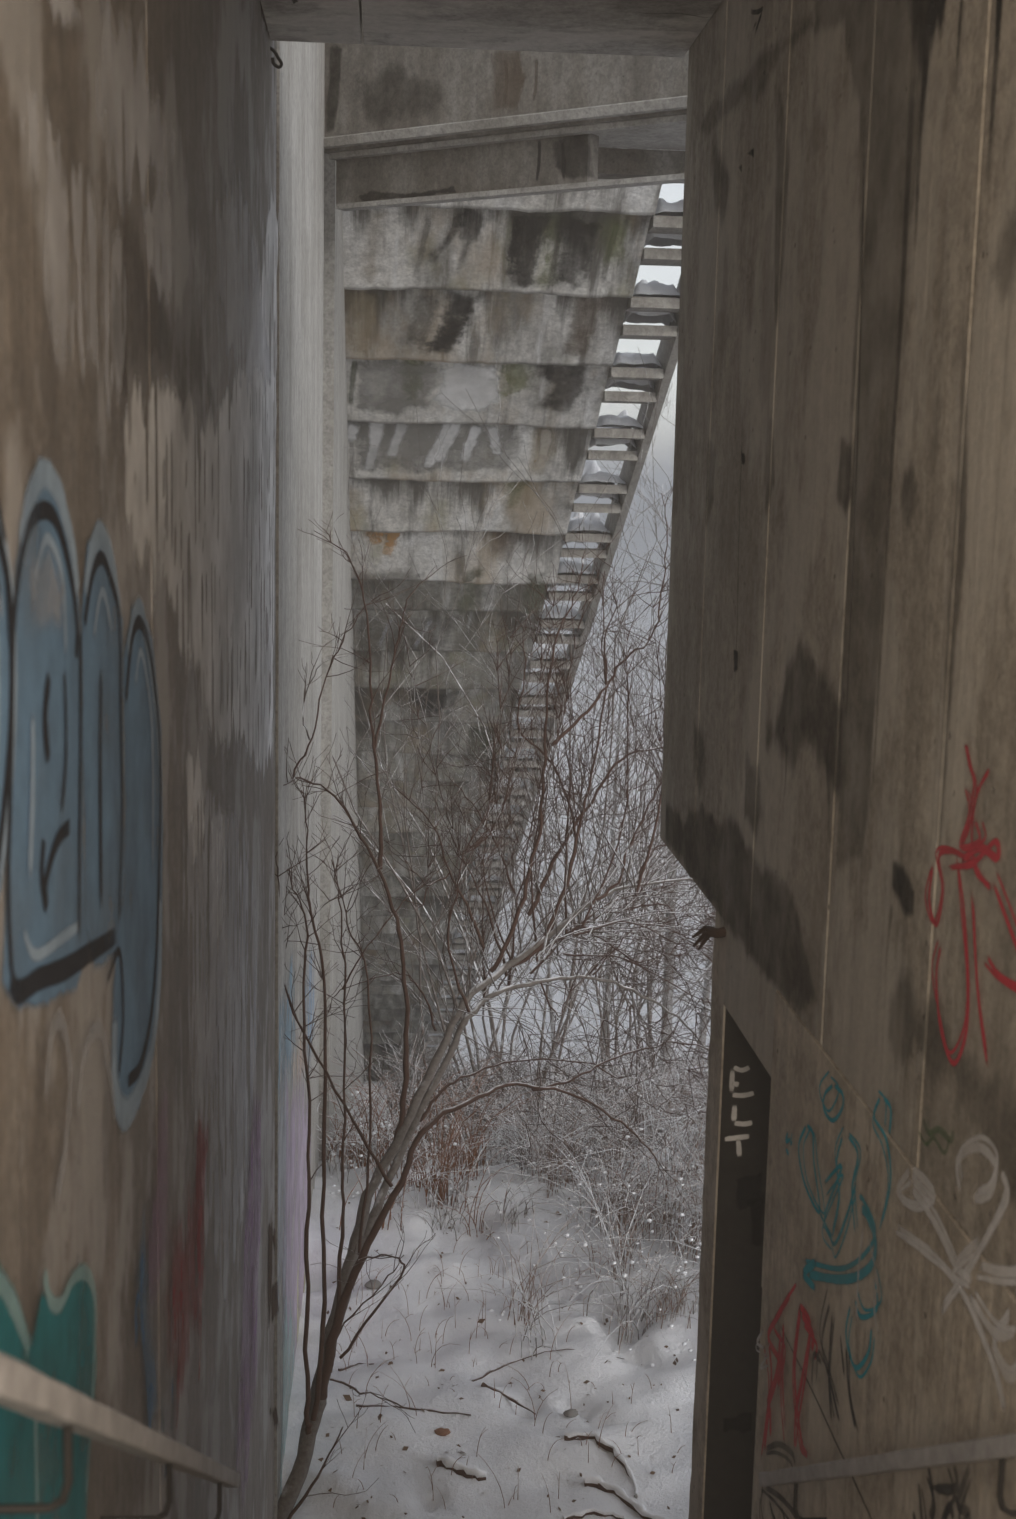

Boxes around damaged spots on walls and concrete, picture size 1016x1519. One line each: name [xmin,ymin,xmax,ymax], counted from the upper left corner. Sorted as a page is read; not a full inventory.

leakage [912,0,963,124]
leakage [994,0,1002,61]
leakage [431,210,483,260]
leakage [508,213,616,287]
leakage [348,294,517,472]
leakage [540,298,603,411]
leakage [666,806,811,1005]